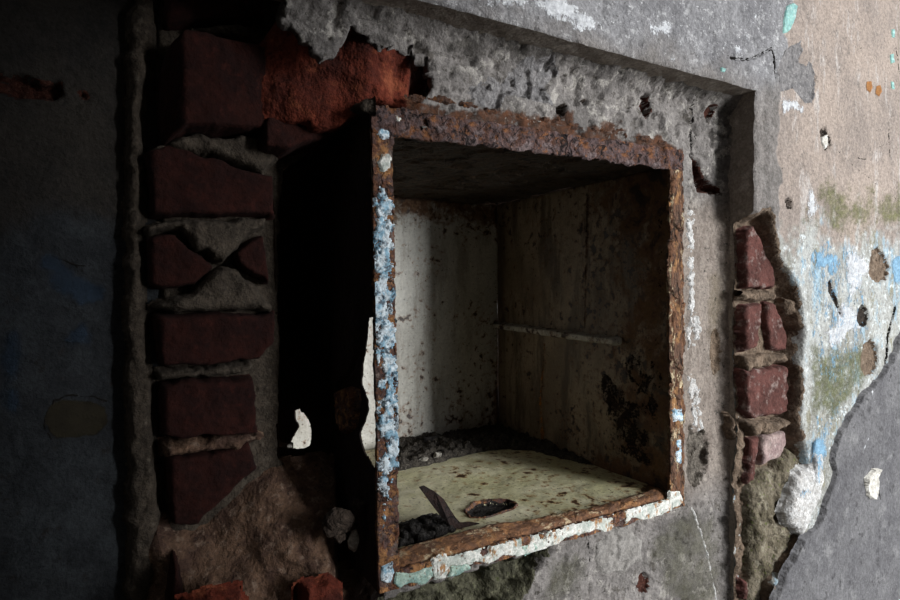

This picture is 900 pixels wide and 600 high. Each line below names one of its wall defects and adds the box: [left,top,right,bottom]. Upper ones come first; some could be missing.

crack [728,47,777,78]
rust [404,94,683,151]
spalling [868,248,889,282]
crack [884,306,896,364]
spalling [860,339,878,376]
flaking render [709,207,824,600]
peeling [864,468,882,499]